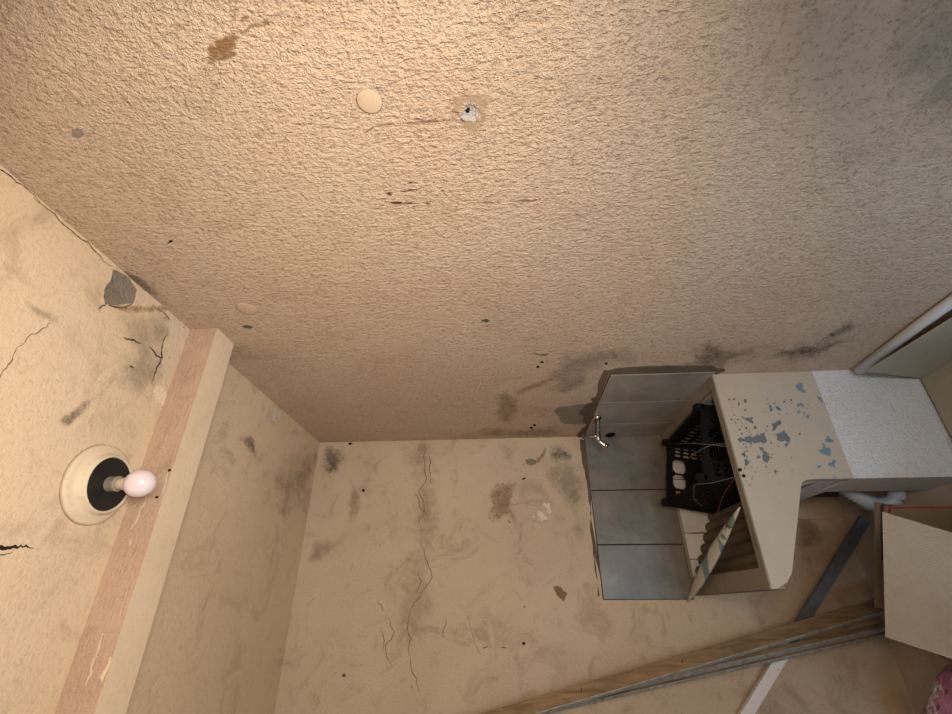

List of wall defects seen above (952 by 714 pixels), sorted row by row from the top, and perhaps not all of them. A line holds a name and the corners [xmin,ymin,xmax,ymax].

damp [209,36,236,60]
spalling [460,104,479,121]
crack [0,169,111,266]
spalling [104,270,137,306]
crack [0,322,50,377]
crack [99,303,184,380]
crack [0,544,33,555]
crack [377,448,433,690]